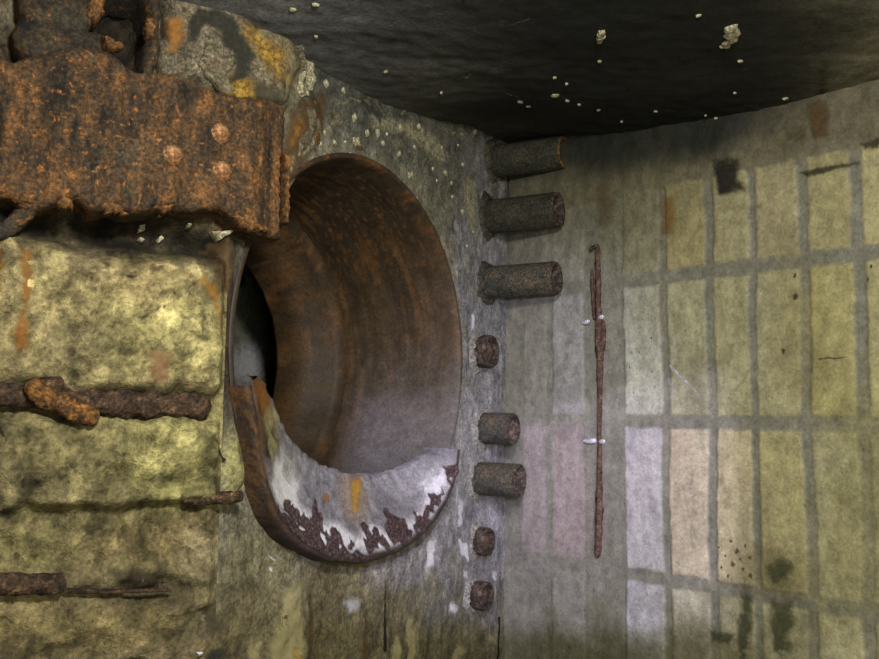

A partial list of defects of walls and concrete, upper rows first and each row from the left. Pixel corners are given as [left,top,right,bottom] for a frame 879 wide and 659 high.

corrosion [279,94,337,225]
corrosion [549,262,563,294]
corrosion [0,351,212,427]
corrosion [506,413,520,444]
corrosion [351,478,361,511]
peeling [264,413,459,559]
corrosion [511,464,527,497]
corrosion [482,528,495,556]
corrosion [0,572,172,597]
water stain [767,559,791,583]
water stain [712,596,752,659]
water stain [772,601,793,651]